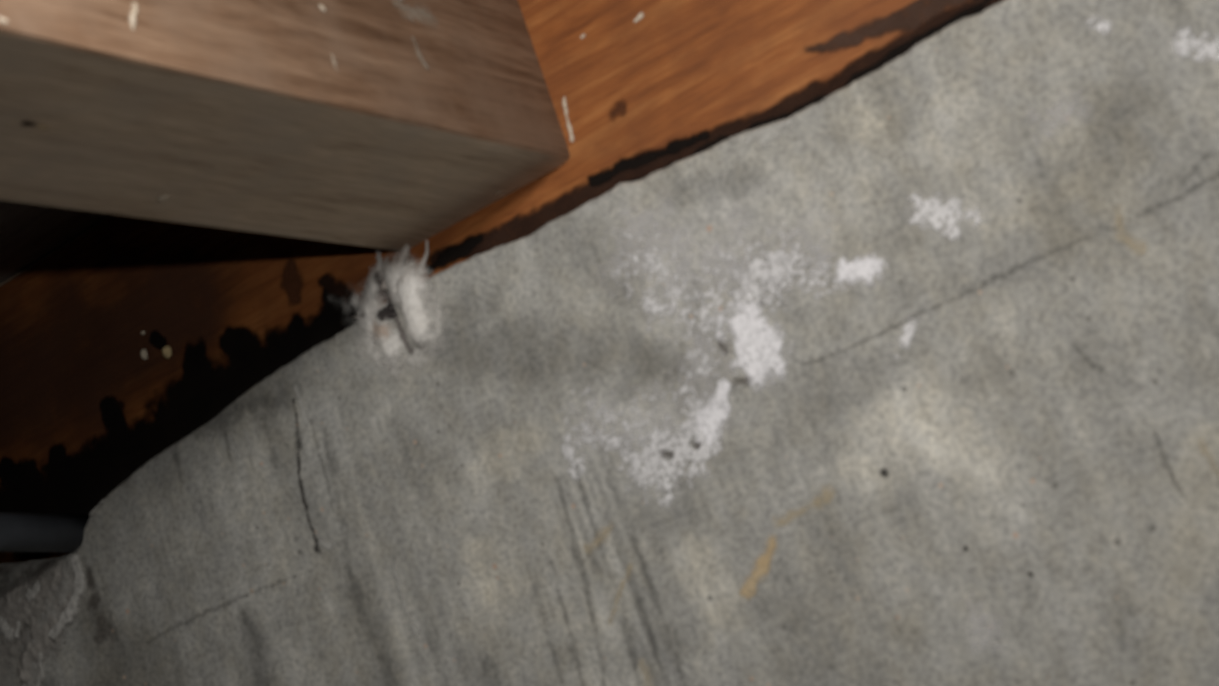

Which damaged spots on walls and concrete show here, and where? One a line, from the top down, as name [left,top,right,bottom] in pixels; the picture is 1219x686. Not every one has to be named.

leakage [1088,19,1110,33]
leakage [1175,28,1219,61]
leakage [896,319,916,358]
leakage [562,224,884,507]
crack [292,386,332,552]